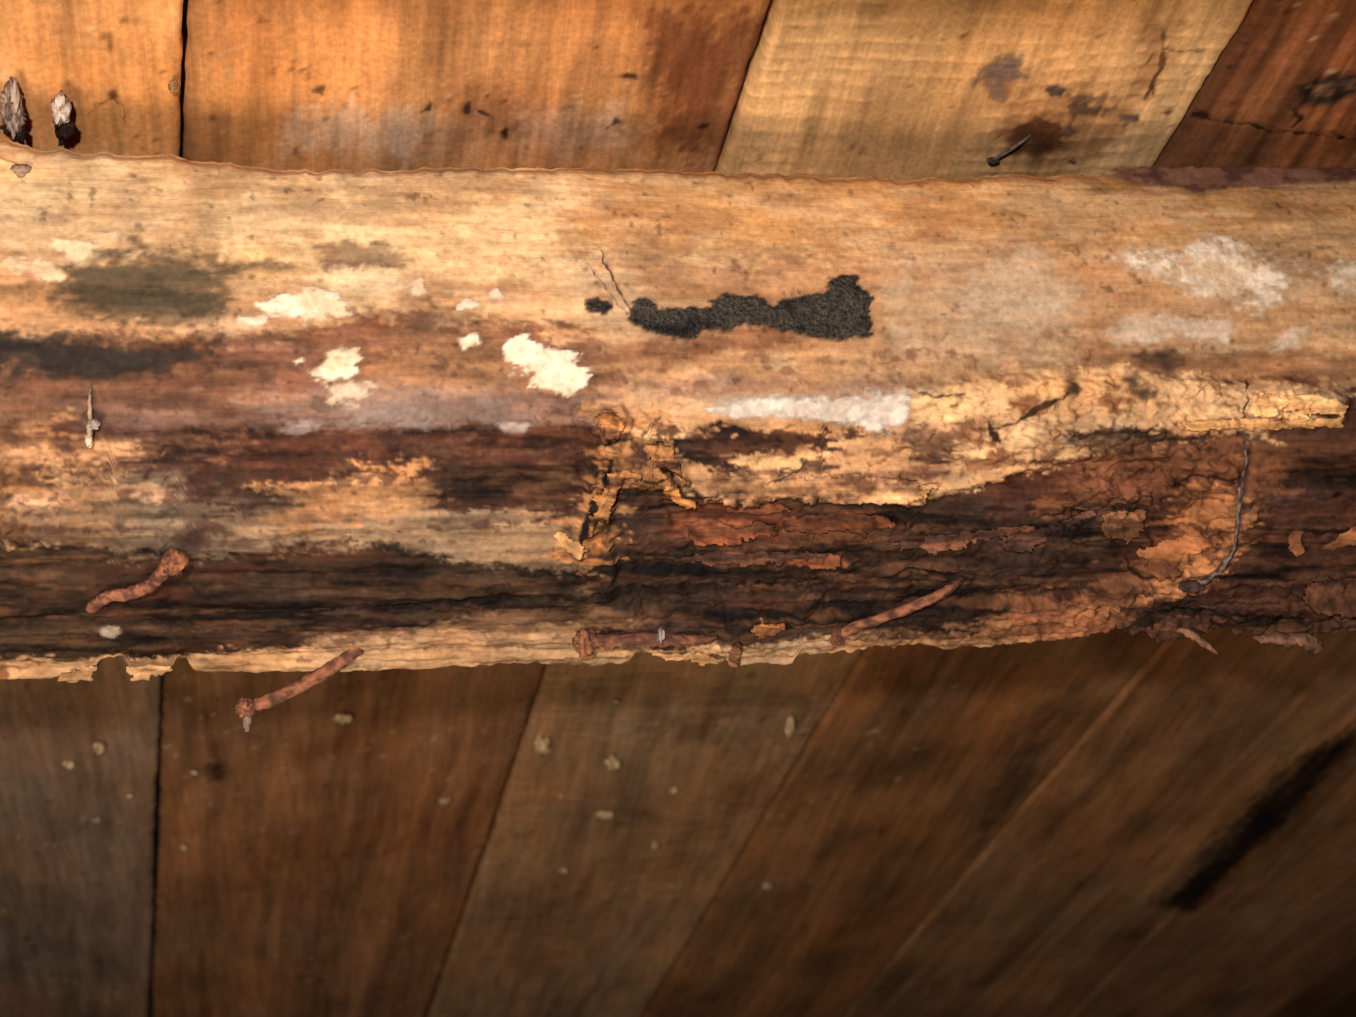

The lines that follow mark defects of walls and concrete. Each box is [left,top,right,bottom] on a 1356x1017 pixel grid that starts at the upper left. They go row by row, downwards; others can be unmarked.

crack [1190,107,1344,138]
leakage [0,229,259,321]
leakage [1113,236,1356,317]
leakage [0,331,220,388]
leakage [1126,376,1155,399]
peeling [663,471,938,510]
peeling [1288,531,1306,557]
peeling [1323,525,1356,551]
peeling [1145,613,1212,643]
peeling [1230,576,1356,655]
corrosion [242,716,252,734]